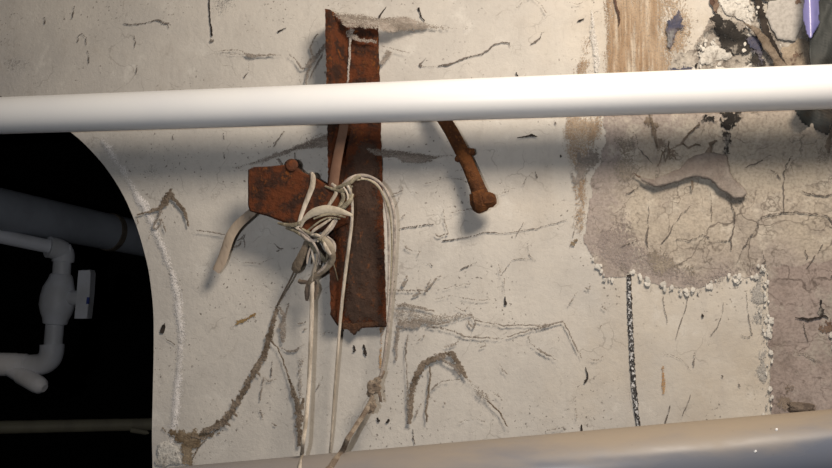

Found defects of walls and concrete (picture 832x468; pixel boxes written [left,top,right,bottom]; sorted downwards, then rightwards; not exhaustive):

crack [419,41,510,67]
water stain [573,34,591,74]
water stain [600,0,698,73]
spalling [667,0,810,71]
water stain [709,0,802,67]
water stain [697,112,741,155]
crack [622,155,832,270]
peeling [583,110,832,415]
crack [627,275,641,426]
crack [786,315,828,361]